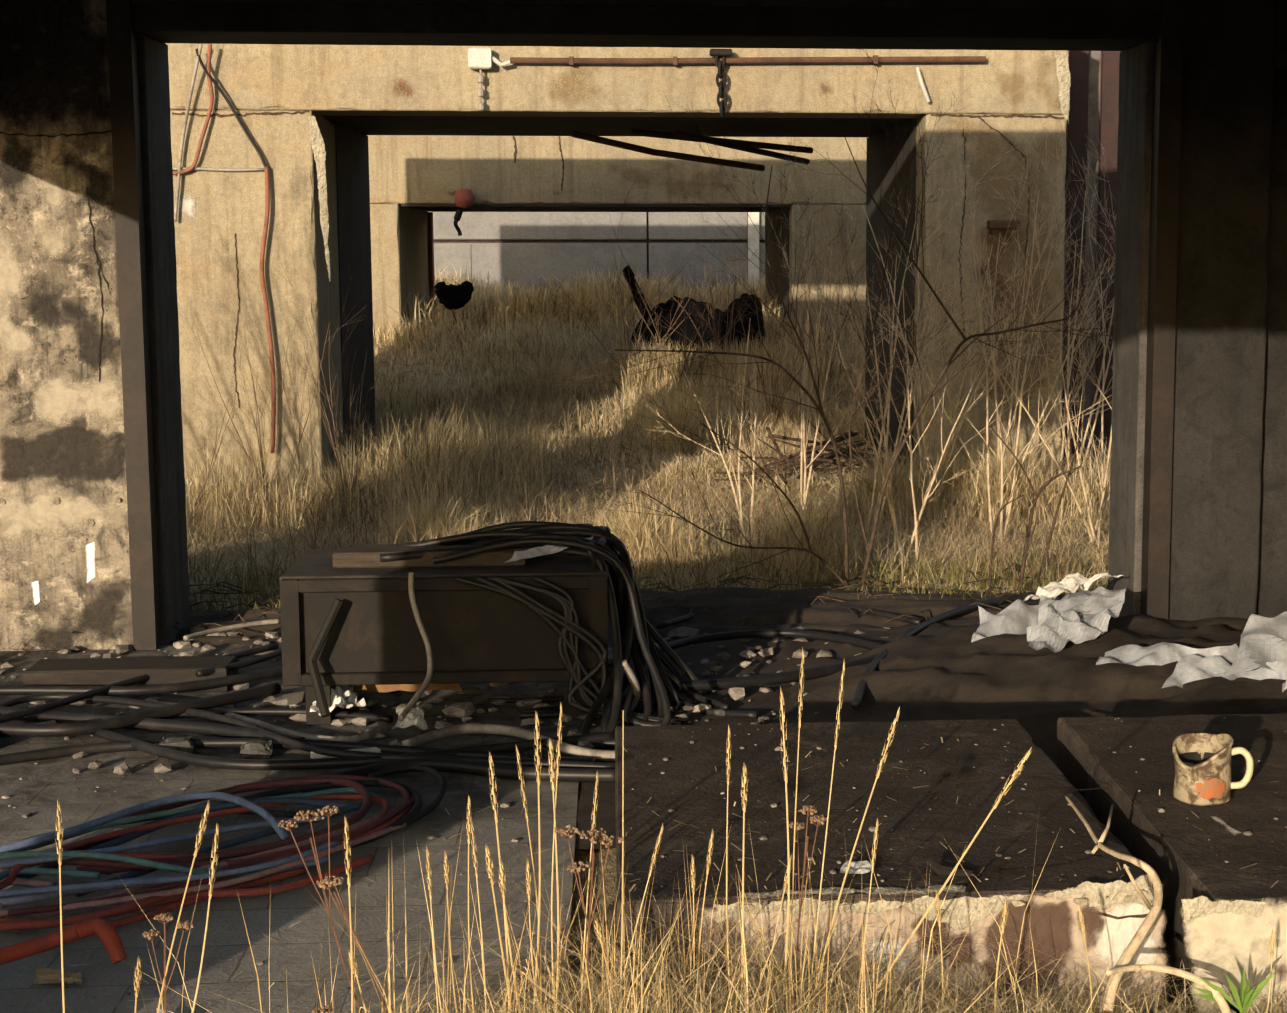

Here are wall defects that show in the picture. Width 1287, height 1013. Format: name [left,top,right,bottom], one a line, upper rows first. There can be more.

crack [0,130,111,138]
water stain [0,149,33,200]
water stain [64,157,115,214]
crack [86,187,111,382]
water stain [31,295,120,376]
water stain [1,426,125,482]